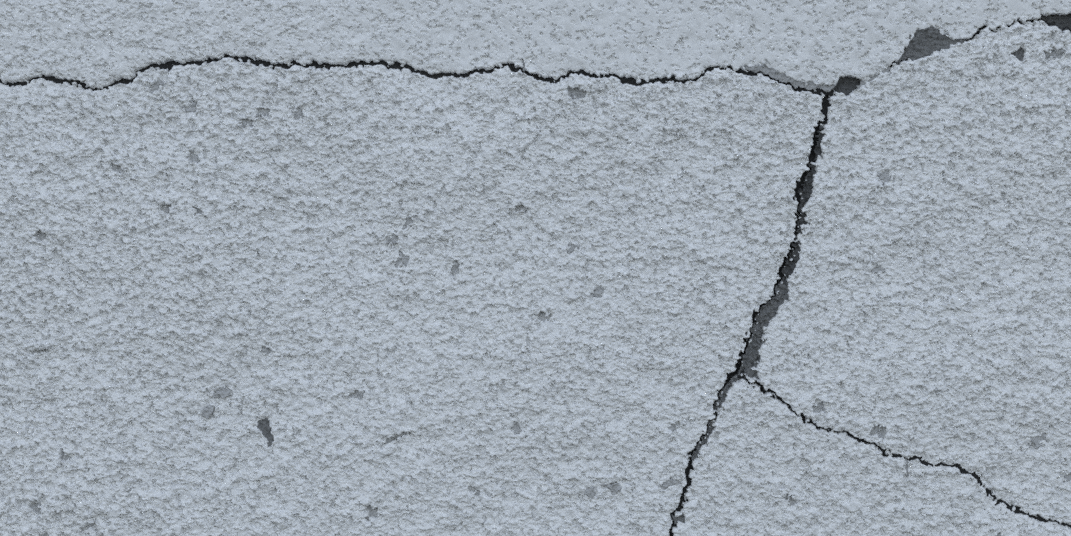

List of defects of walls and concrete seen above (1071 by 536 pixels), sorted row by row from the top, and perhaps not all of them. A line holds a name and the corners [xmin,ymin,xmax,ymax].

crack [857,50,937,89]
crack [965,18,1071,41]
crack [0,54,837,406]
crack [669,420,711,536]
crack [753,381,1071,528]